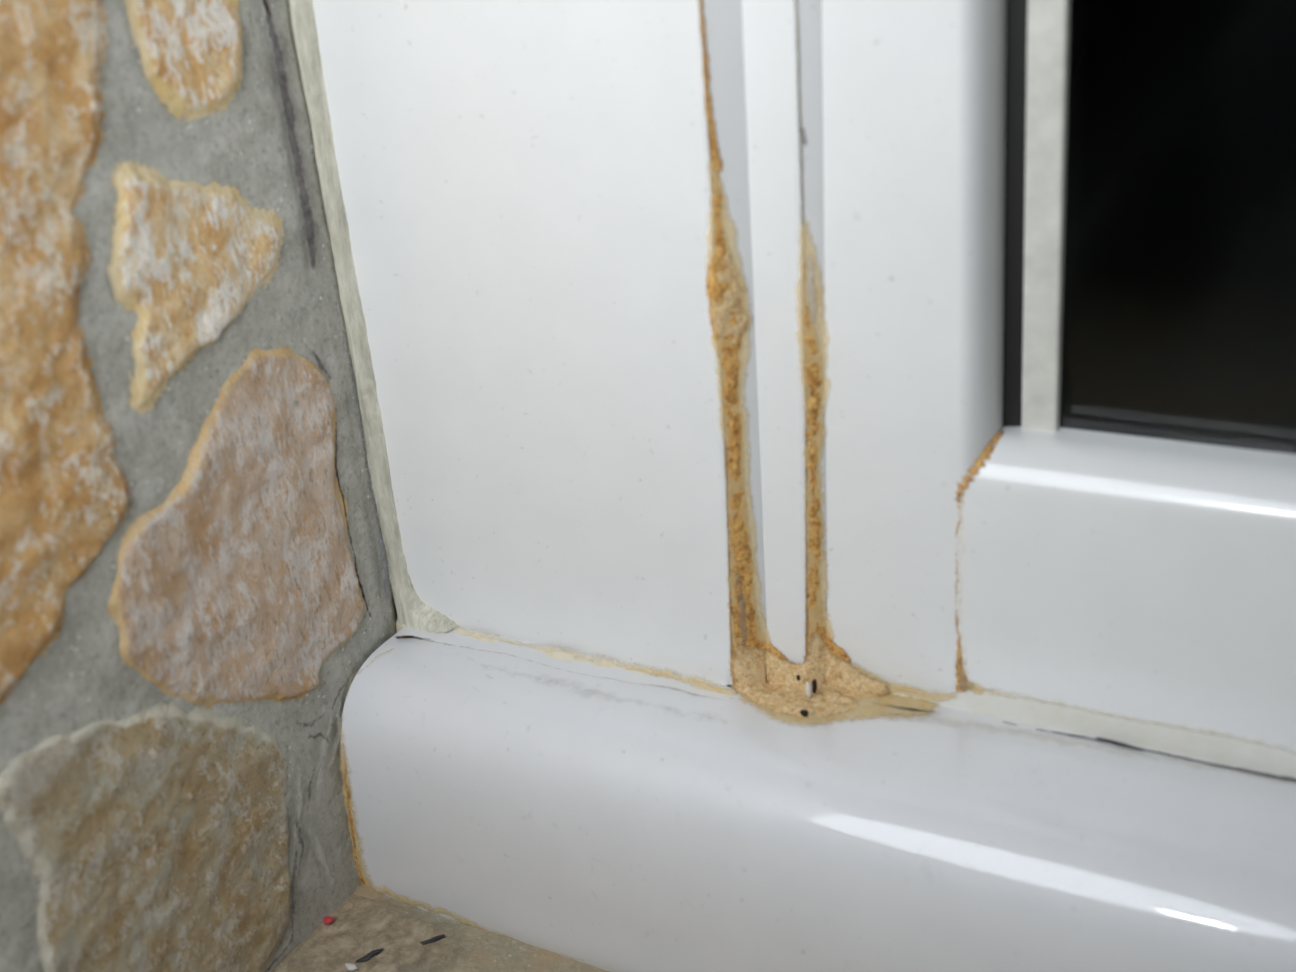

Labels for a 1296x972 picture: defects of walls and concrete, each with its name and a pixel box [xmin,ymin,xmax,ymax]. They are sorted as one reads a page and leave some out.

corrosion [699,0,935,724]
corrosion [956,430,1003,501]
corrosion [956,610,981,694]